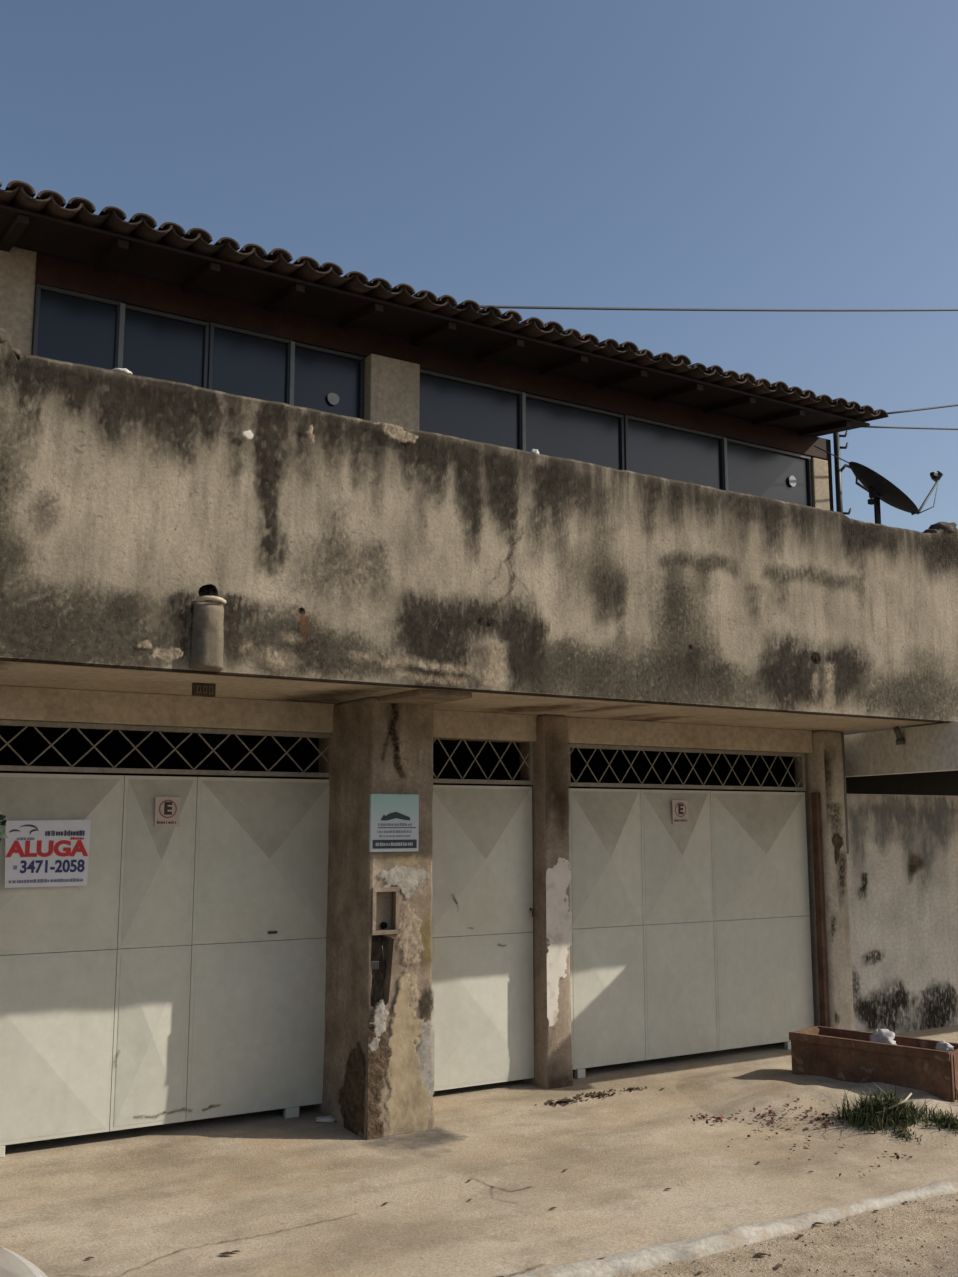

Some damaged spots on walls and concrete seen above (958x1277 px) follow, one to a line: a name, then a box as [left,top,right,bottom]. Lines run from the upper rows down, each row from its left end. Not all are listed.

water stain [0,358,958,720]
crack [507,527,523,608]
crack [382,703,405,777]
water stain [853,795,954,868]
peeling [546,857,572,1027]
peeling [338,865,435,1140]
water stain [852,973,957,1033]